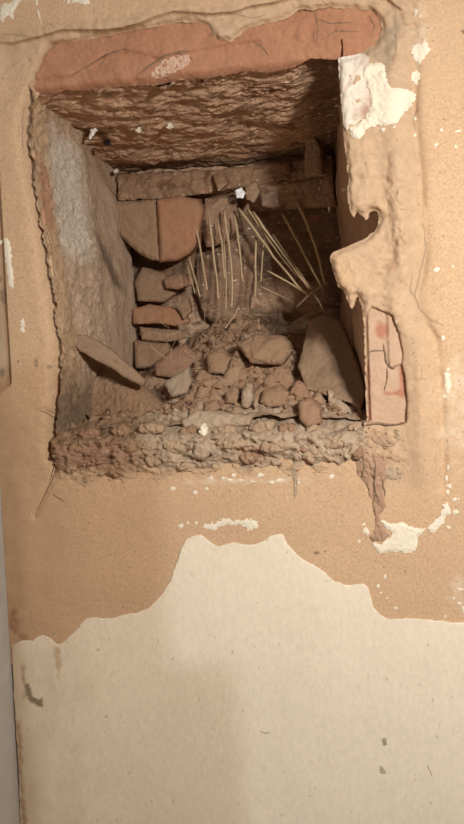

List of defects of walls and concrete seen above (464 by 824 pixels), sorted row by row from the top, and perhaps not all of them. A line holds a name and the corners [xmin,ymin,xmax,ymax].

crack [6,0,284,75]
crack [314,0,398,60]
spalling [28,7,409,487]
spalling [356,451,392,542]